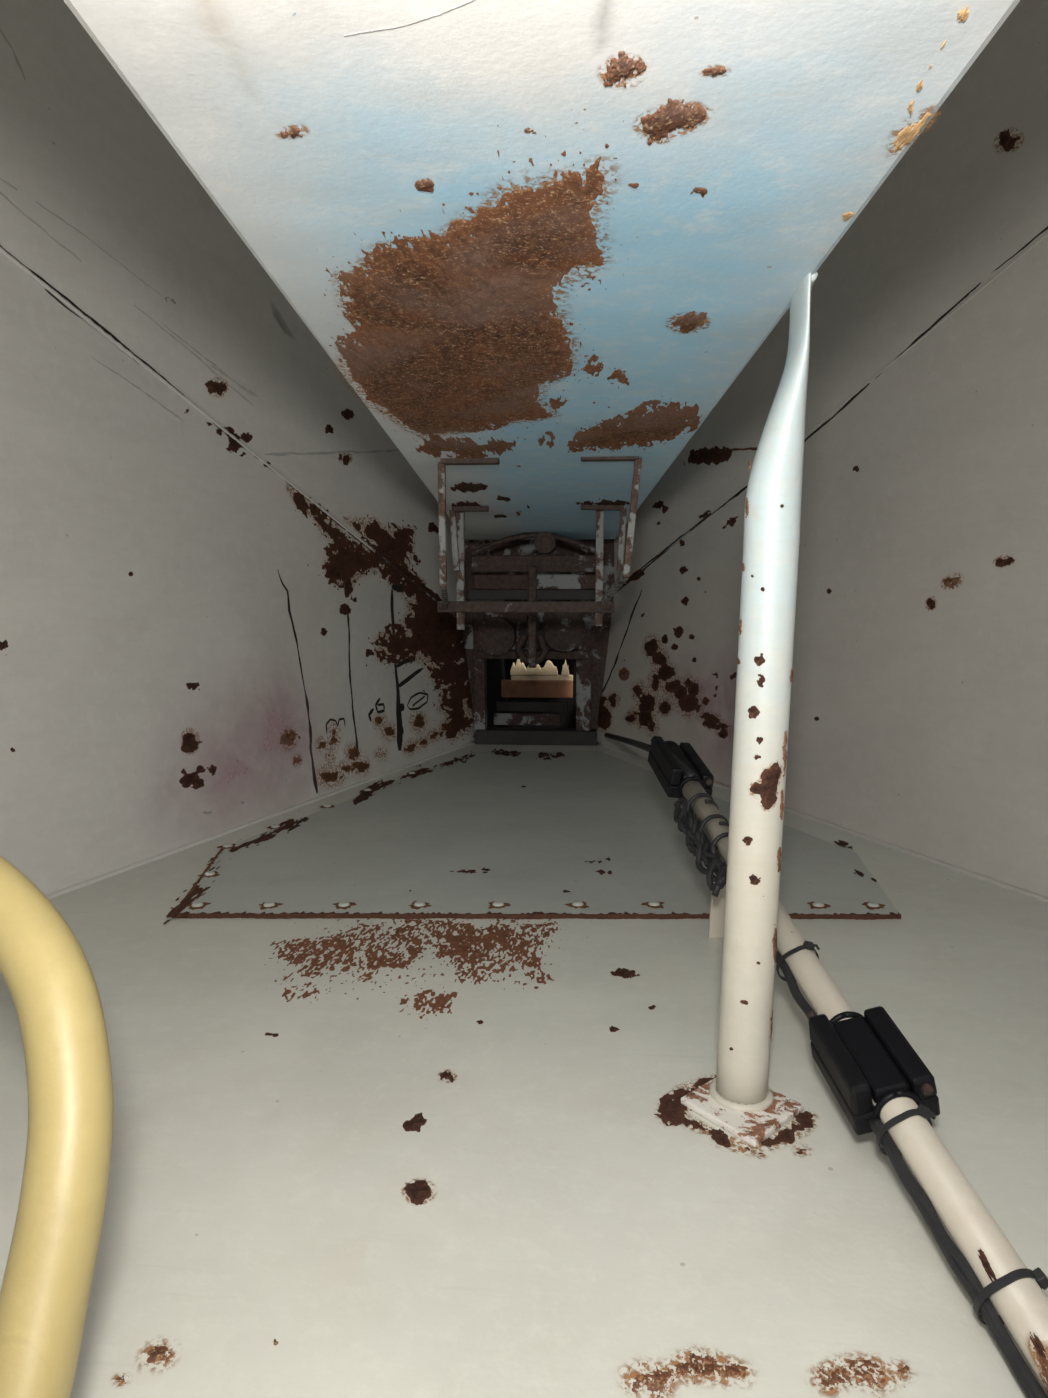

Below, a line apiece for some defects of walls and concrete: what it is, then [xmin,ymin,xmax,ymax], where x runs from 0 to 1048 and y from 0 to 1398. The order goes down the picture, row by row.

rust [600,51,647,88]
rust [623,98,709,146]
rust [320,144,732,467]
rust [280,485,475,805]
rust [597,626,766,739]
rust [179,728,217,790]
rust [750,731,788,820]
rust [163,805,710,1019]
rust [654,1075,816,1157]
rust [402,1179,434,1205]
rust [622,1347,752,1398]
rust [812,1351,911,1398]